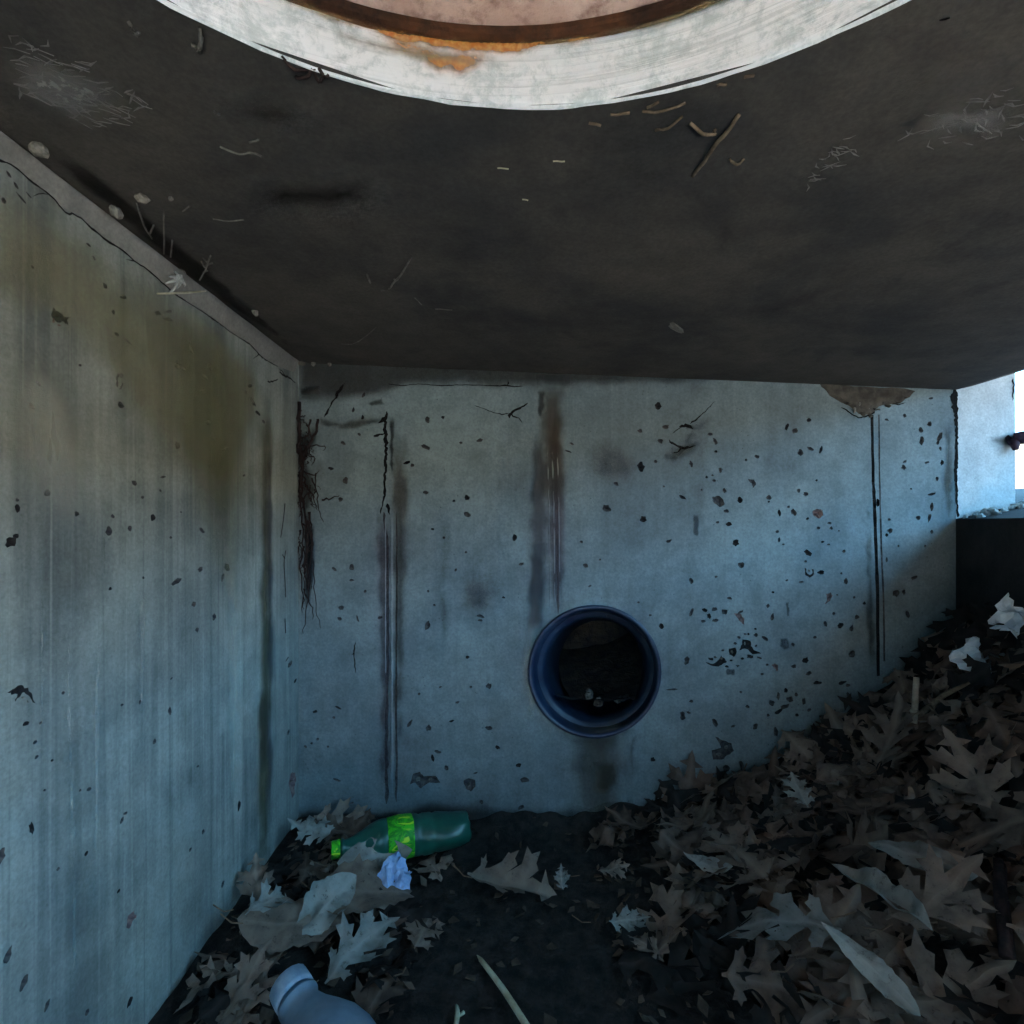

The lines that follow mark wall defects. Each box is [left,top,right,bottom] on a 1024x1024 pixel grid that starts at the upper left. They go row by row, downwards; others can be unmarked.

corrosion [377,29,591,72]
crack [0,159,295,383]
crack [397,382,528,422]
peeling [820,384,915,421]
spalling [919,421,944,465]
leakage [530,393,564,624]
leakage [379,423,406,768]